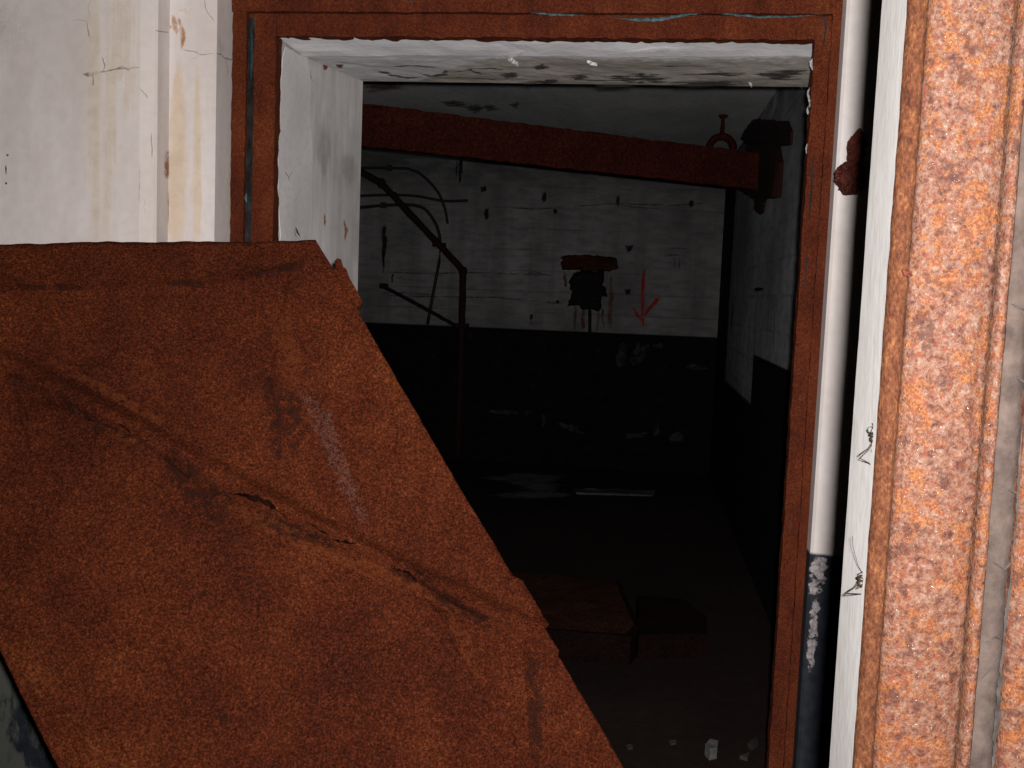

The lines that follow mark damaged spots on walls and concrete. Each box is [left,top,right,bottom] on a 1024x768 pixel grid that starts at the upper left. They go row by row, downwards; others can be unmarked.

crack [82,0,147,97]
corrosion [170,9,188,48]
corrosion [164,62,203,242]
corrosion [215,495,480,678]
peeling [806,557,829,672]